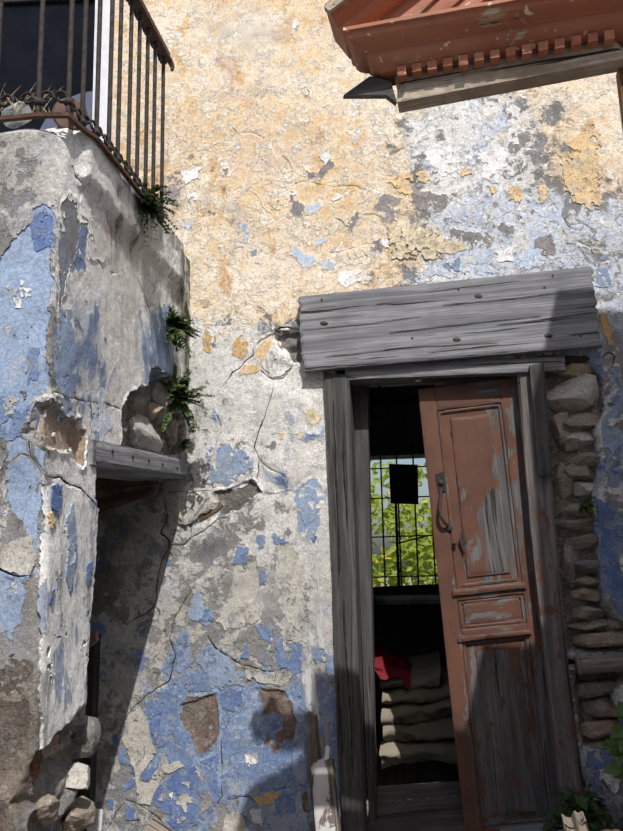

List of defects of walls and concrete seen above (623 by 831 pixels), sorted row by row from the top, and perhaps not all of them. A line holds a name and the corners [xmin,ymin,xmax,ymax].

peeling [159,166,203,213]
peeling [268,190,322,219]
peeling [301,150,336,185]
peeling [346,122,603,284]
peeling [287,236,373,290]
flaking render [228,327,304,377]
peeling [598,309,617,348]
peeling [0,177,266,831]
crack [98,324,323,769]
crack [0,568,30,582]
flaking render [538,351,623,808]
peeling [105,475,329,831]